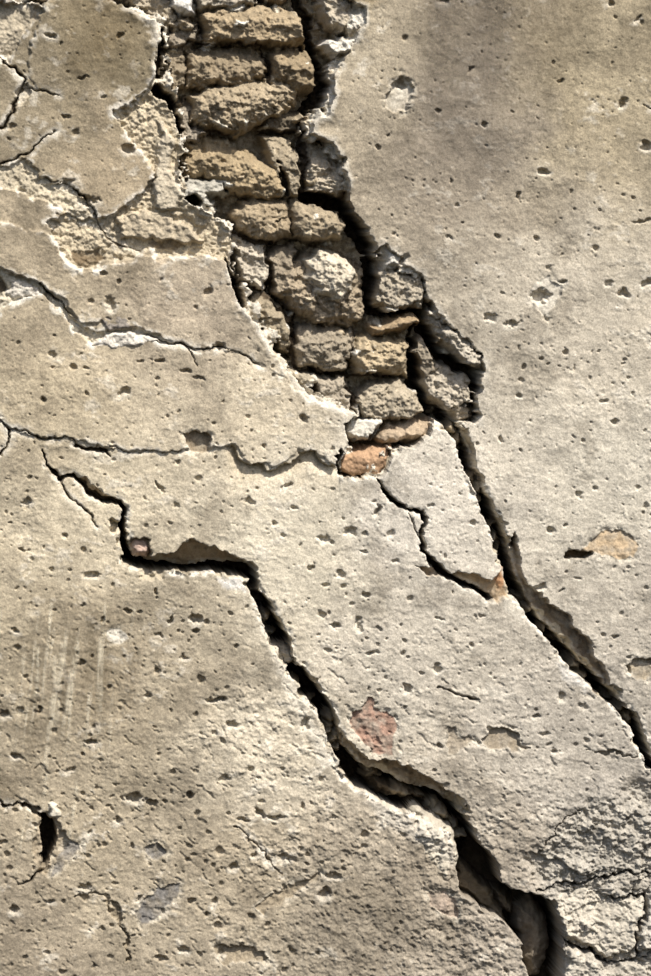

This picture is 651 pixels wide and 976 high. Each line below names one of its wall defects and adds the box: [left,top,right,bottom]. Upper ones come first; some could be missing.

crack [0,58,61,131]
crack [0,130,57,165]
crack [44,177,143,253]
spalling [0,0,487,482]
crack [39,283,74,317]
crack [224,258,246,309]
crack [138,333,263,368]
spalling [564,529,640,561]
crack [377,404,651,770]
crack [0,419,566,976]
spalling [350,696,399,757]
crack [535,809,584,857]